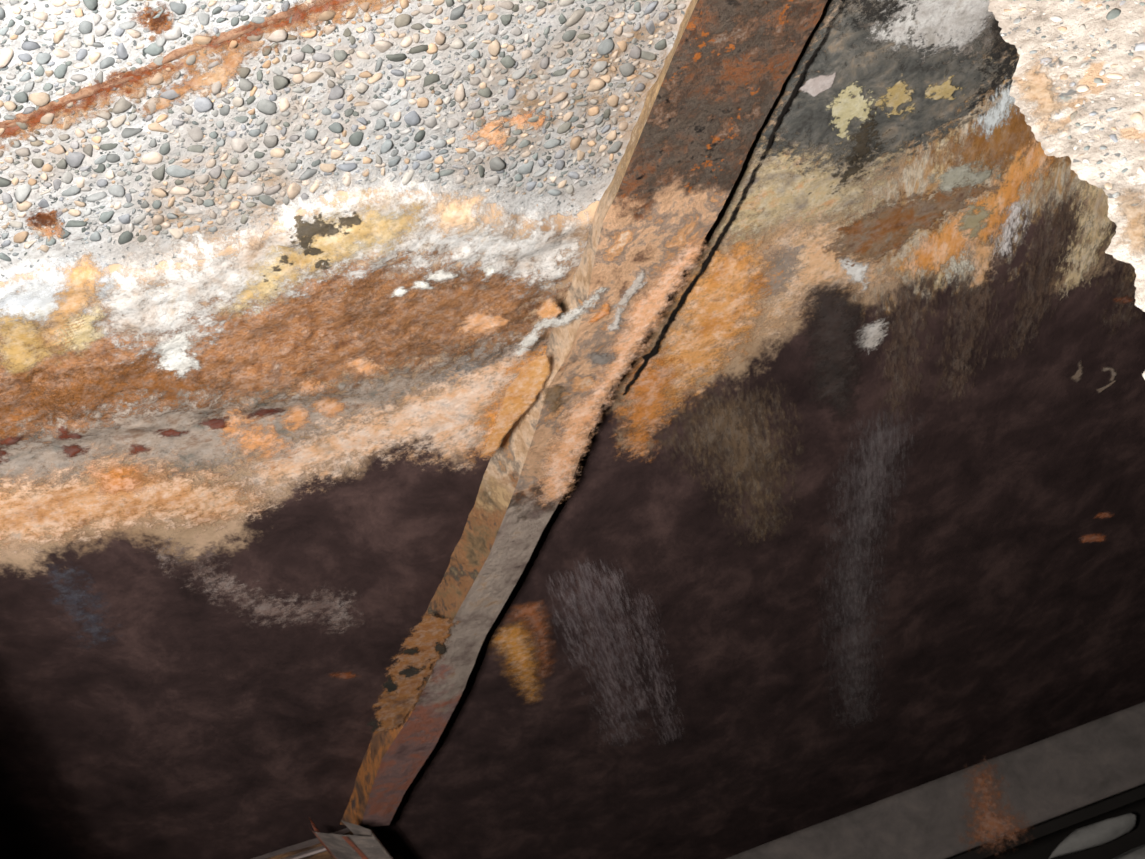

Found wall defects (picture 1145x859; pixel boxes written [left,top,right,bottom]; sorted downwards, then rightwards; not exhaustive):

corrosion [25,207,63,239]
corrosion [0,0,410,150]
corrosion [465,110,553,151]
crack [622,0,843,396]
damp [700,0,1115,348]
corrosion [0,237,578,553]
damp [0,156,607,492]
damp [608,271,647,331]
damp [665,389,786,537]
damp [156,538,356,633]
damp [549,562,680,746]
corrosion [967,766,1024,847]